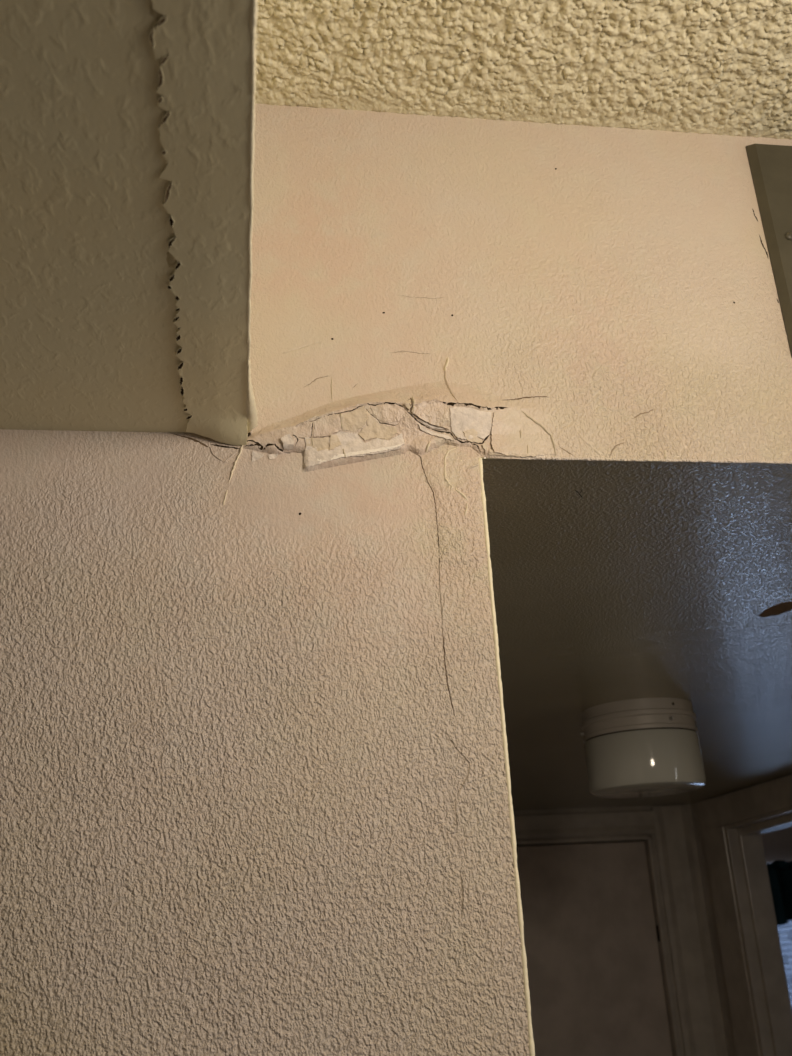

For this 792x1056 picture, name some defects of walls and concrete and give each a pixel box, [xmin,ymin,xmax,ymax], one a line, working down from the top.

peeling [247,360,258,437]
crack [148,0,549,830]
flaking render [251,357,556,516]
peeling [759,602,792,617]
crack [458,872,466,912]